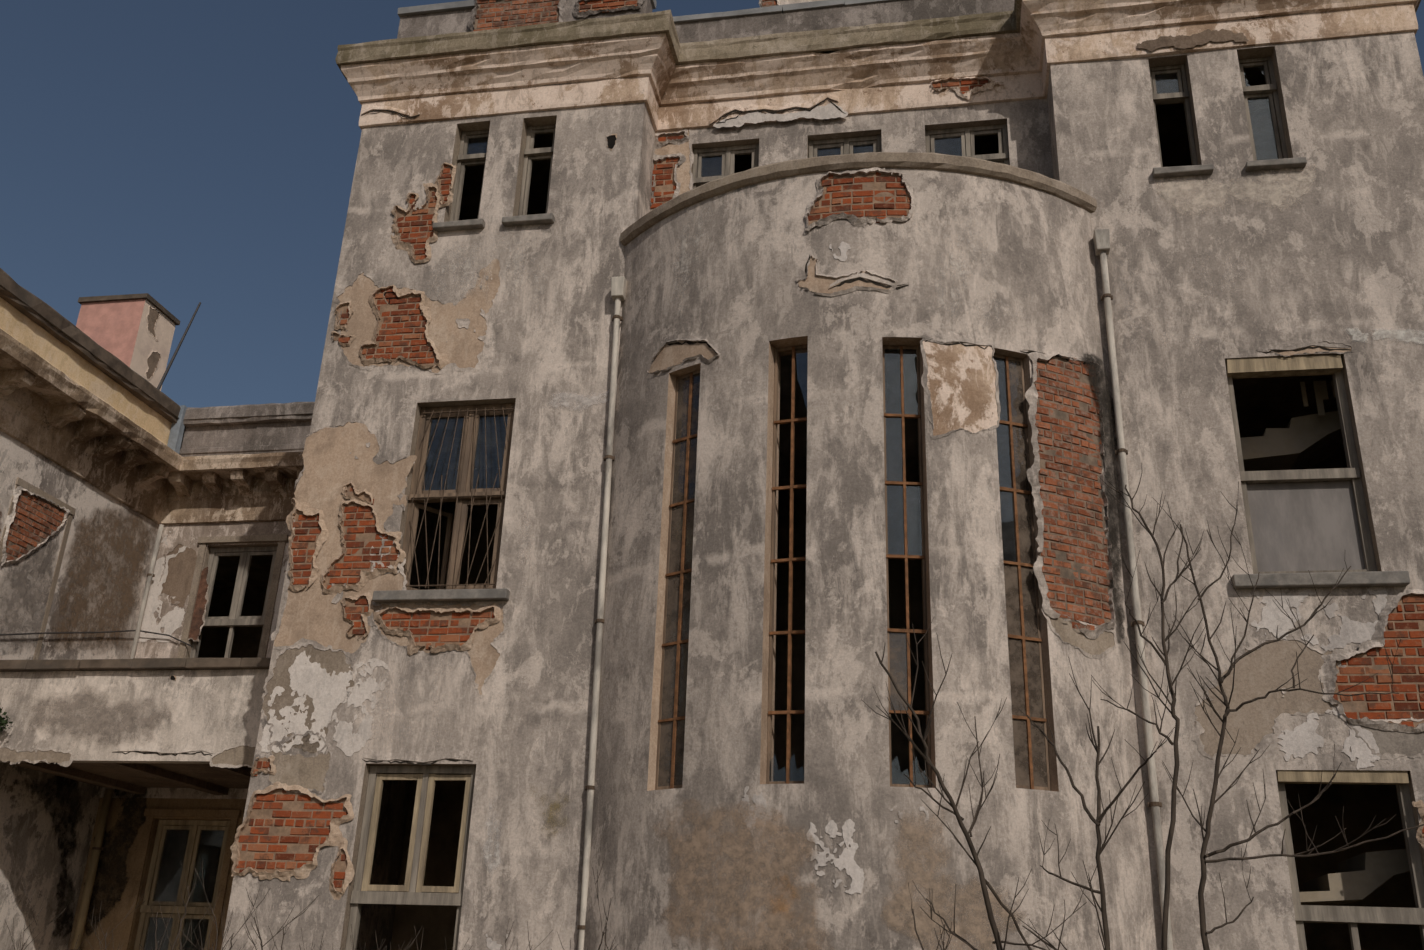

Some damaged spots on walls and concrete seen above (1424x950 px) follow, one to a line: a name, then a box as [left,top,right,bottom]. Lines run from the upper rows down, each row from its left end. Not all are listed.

spalling [713,103,848,128]
flaking render [652,129,694,209]
spalling [796,255,898,297]
flaking render [334,259,501,375]
spalling [647,337,720,374]
flaking render [920,339,1001,440]
flaking render [210,421,507,794]